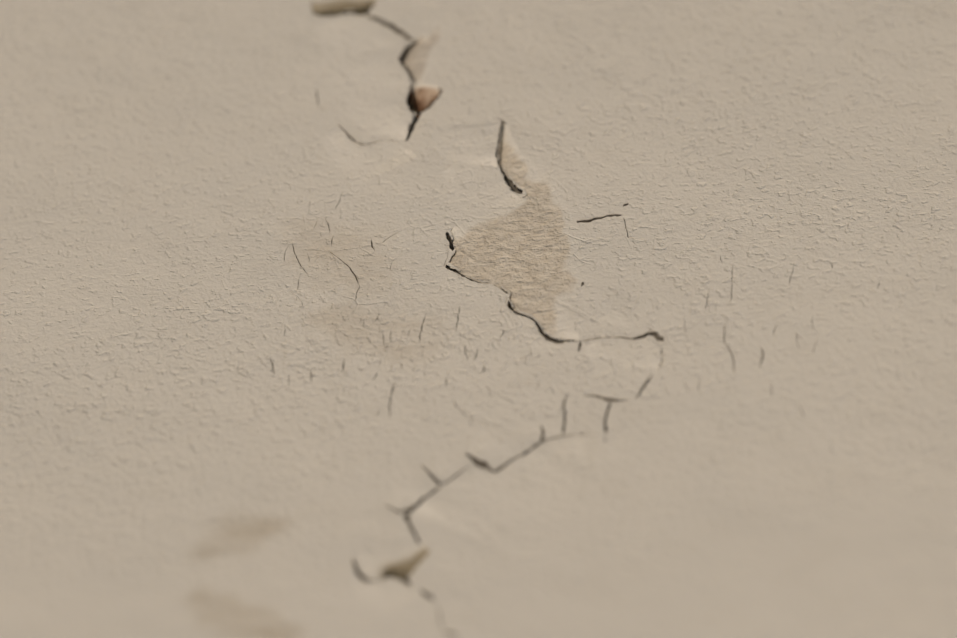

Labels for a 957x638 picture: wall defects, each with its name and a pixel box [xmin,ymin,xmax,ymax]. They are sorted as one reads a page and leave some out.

spalling [311,0,376,17]
peeling [400,19,446,121]
crack [325,218,375,298]
peeling [432,120,584,355]
crack [577,203,629,238]
crack [376,308,488,426]
crack [585,322,686,342]
crack [385,379,699,544]